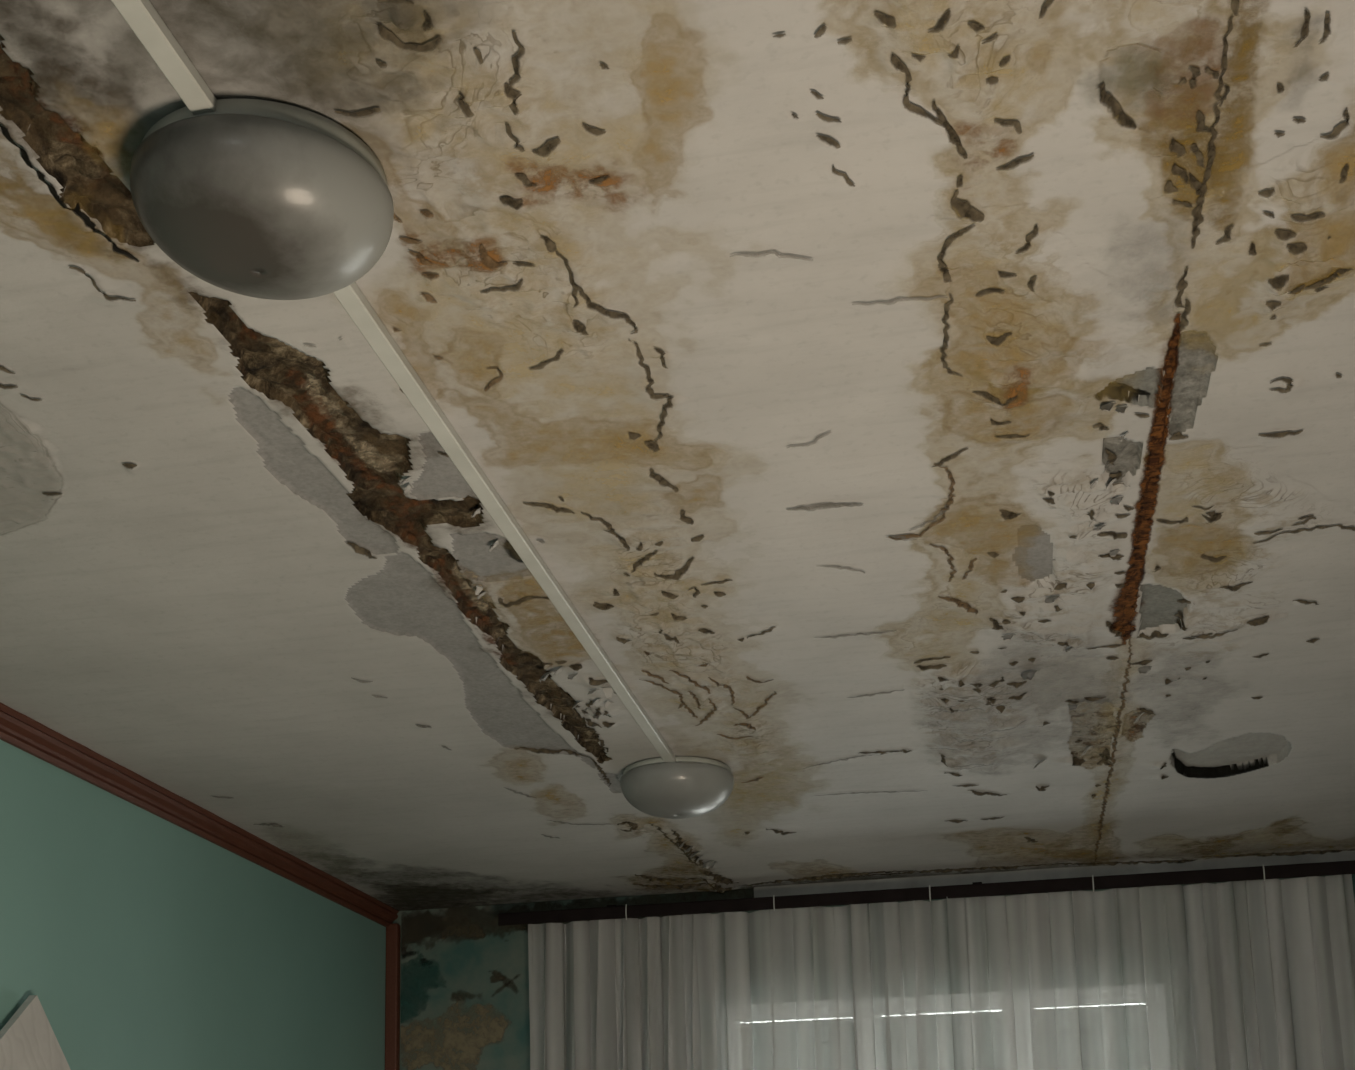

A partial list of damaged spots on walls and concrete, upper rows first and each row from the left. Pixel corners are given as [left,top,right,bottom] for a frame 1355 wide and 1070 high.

damp [161,0,370,108]
spalling [165,272,622,793]
damp [414,240,501,272]
crack [474,32,606,210]
damp [500,152,625,205]
crack [480,236,678,492]
peeling [604,510,732,644]
crack [874,10,1038,614]
corrosion [1109,313,1181,644]
spalling [1095,330,1218,436]
corrosion [1152,0,1254,224]
crack [617,515,1355,893]